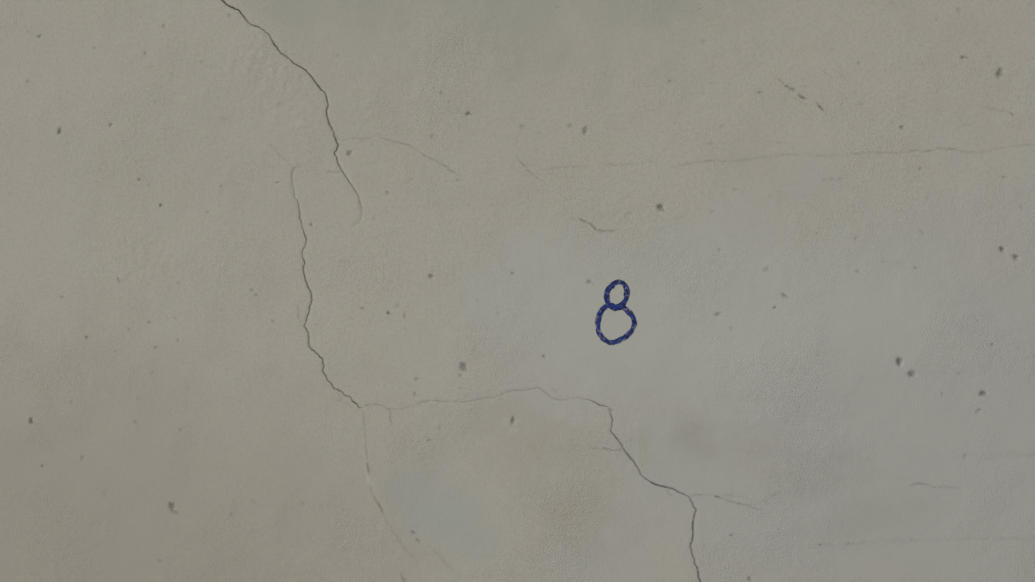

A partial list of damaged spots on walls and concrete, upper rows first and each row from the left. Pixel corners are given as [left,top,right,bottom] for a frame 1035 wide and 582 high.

crack [220,0,785,582]